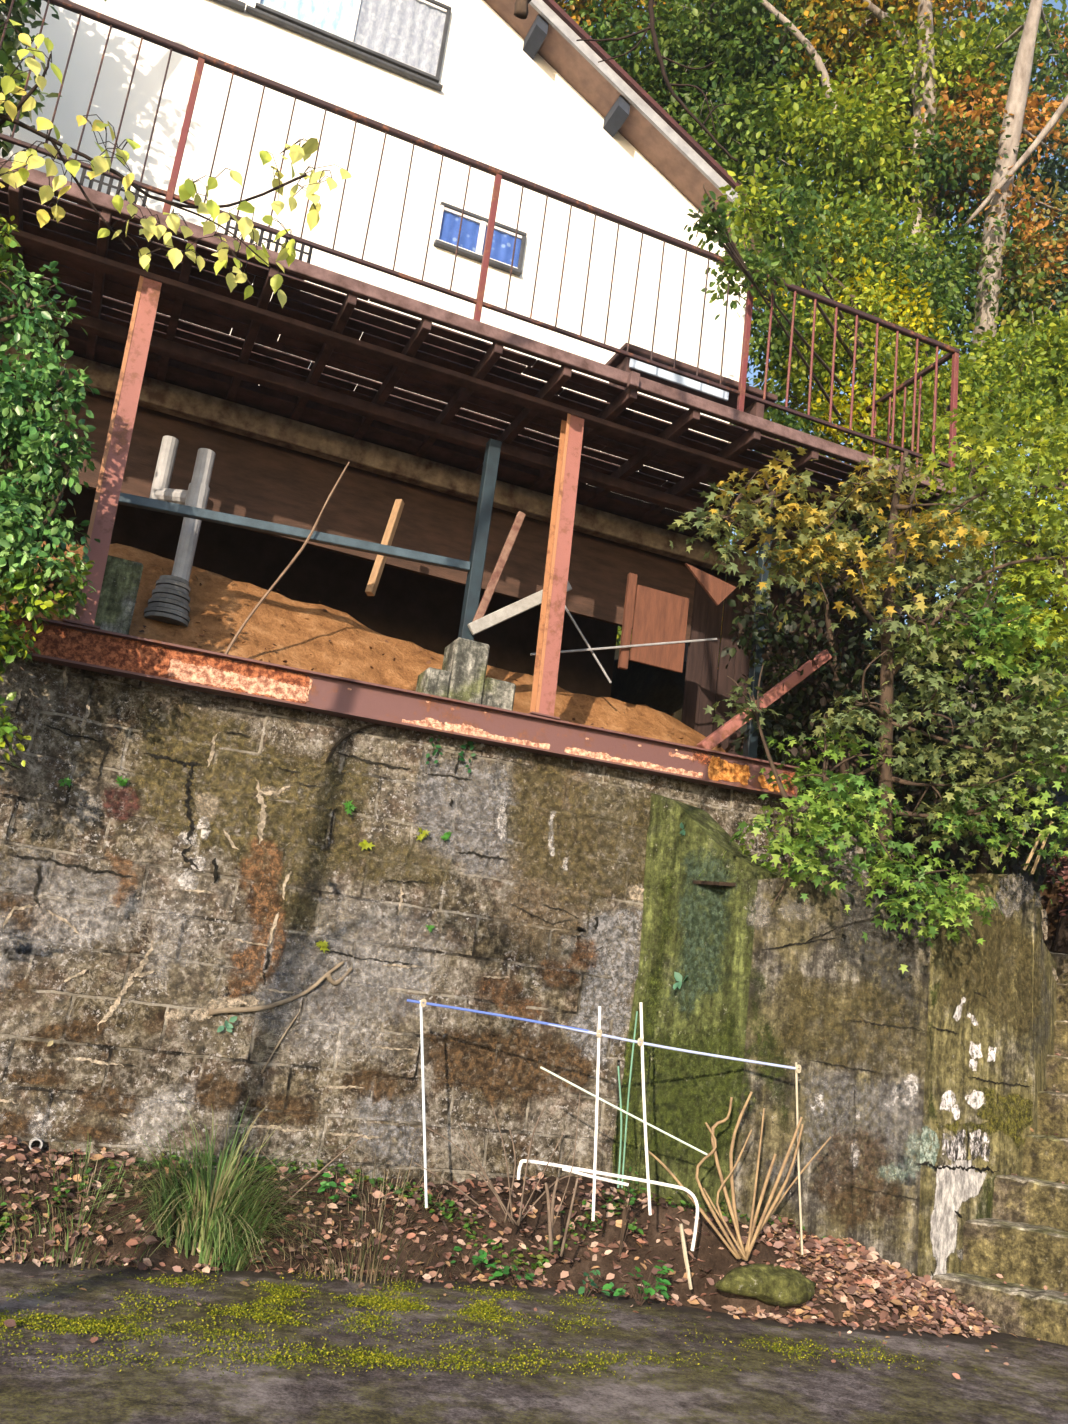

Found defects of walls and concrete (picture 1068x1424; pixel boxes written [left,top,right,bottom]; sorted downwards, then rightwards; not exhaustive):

rust [2,616,313,704]
crack [15,694,110,779]
rust [402,701,796,795]
crack [277,767,318,787]
crack [336,752,468,806]
crack [144,753,218,883]
crack [7,853,137,907]
crack [385,878,432,886]
crack [456,851,505,860]
damp [953,997,978,1026]
damp [969,1043,997,1071]
damp [940,1090,985,1120]